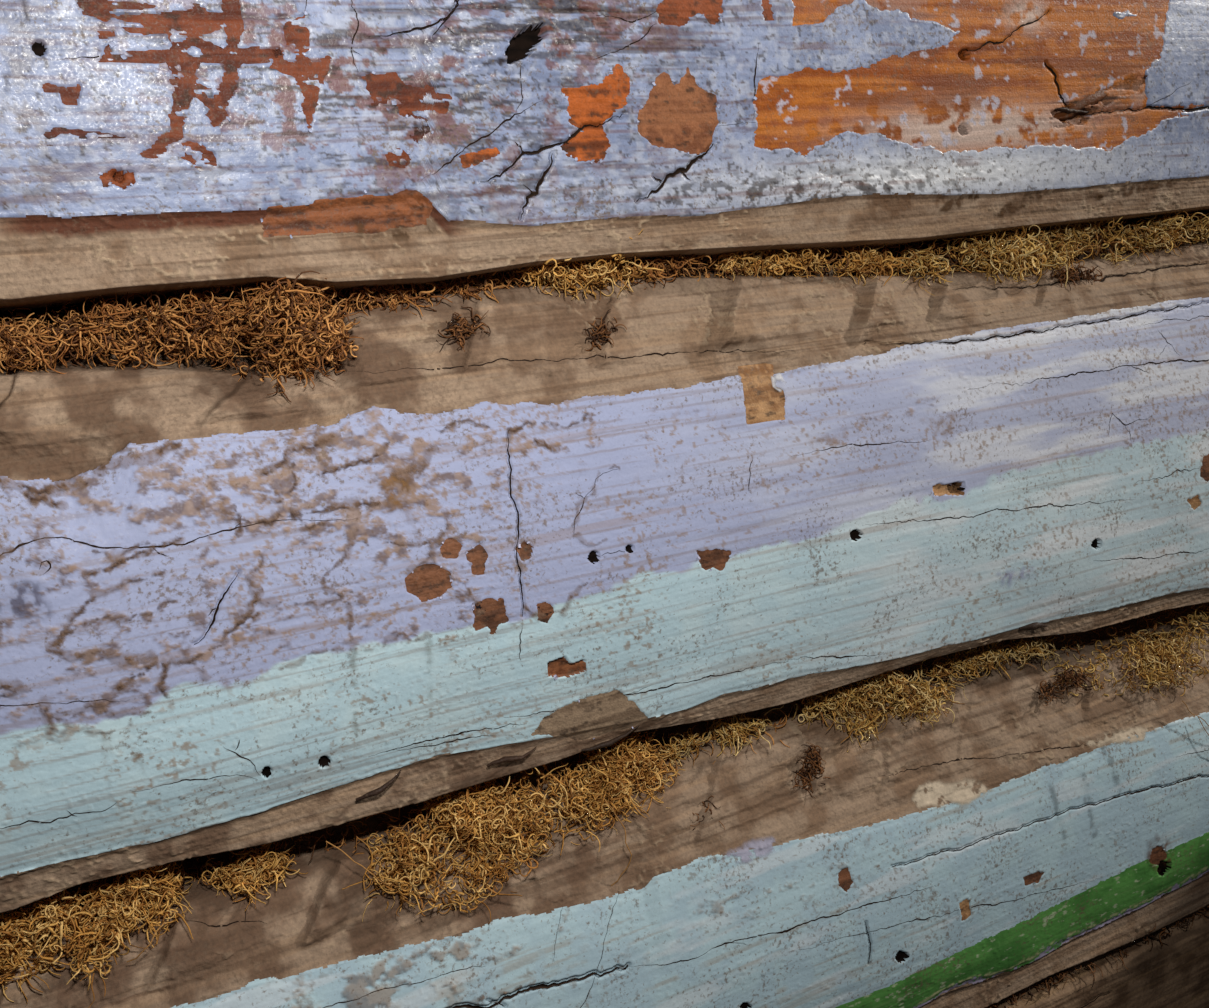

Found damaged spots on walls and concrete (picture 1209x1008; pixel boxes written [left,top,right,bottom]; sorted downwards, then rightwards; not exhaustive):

peeling [77,0,332,168]
peeling [362,70,452,168]
crack [416,58,622,217]
crack [637,45,759,201]
peeling [753,0,1204,157]
crack [1045,62,1209,117]
peeling [737,363,787,424]
crack [1,518,356,574]
peeling [405,538,488,602]
crack [507,431,524,660]
peeling [531,690,648,740]
crack [453,750,1209,1008]